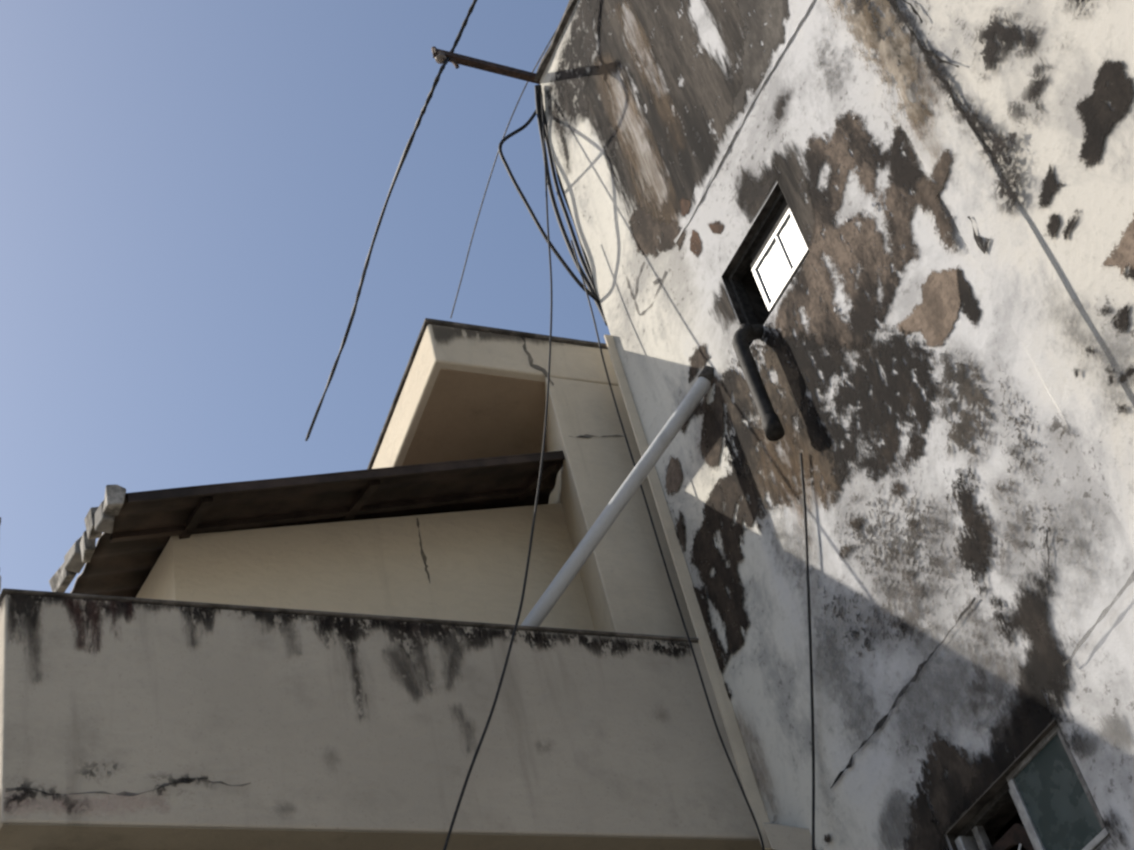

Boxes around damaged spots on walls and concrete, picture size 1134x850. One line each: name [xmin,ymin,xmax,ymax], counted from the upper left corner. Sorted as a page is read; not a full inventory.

water stain [545,0,750,225]
water stain [735,144,823,286]
peeling [768,110,982,356]
water stain [967,216,989,254]
peeling [1103,213,1134,280]
water stain [714,284,736,326]
crack [522,336,554,385]
crack [569,432,624,440]
water stain [705,321,1085,745]
water stain [0,594,221,656]
water stain [235,610,690,716]
crack [5,777,251,797]